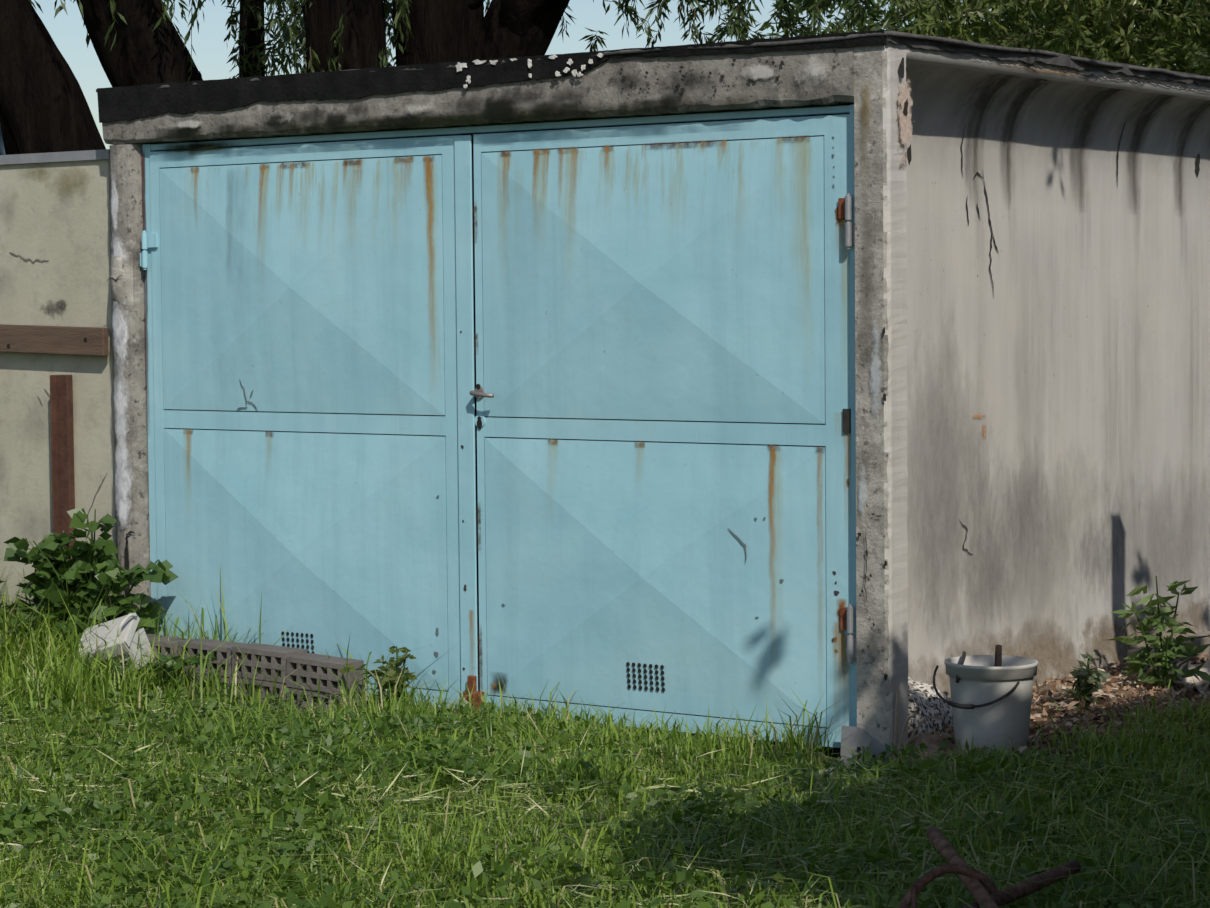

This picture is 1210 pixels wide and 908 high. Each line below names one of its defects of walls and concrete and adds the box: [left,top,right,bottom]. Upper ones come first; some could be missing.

peeling [463,58,532,89]
peeling [548,53,603,77]
leakage [157,73,705,153]
corrosion [395,157,432,258]
corrosion [768,445,777,523]